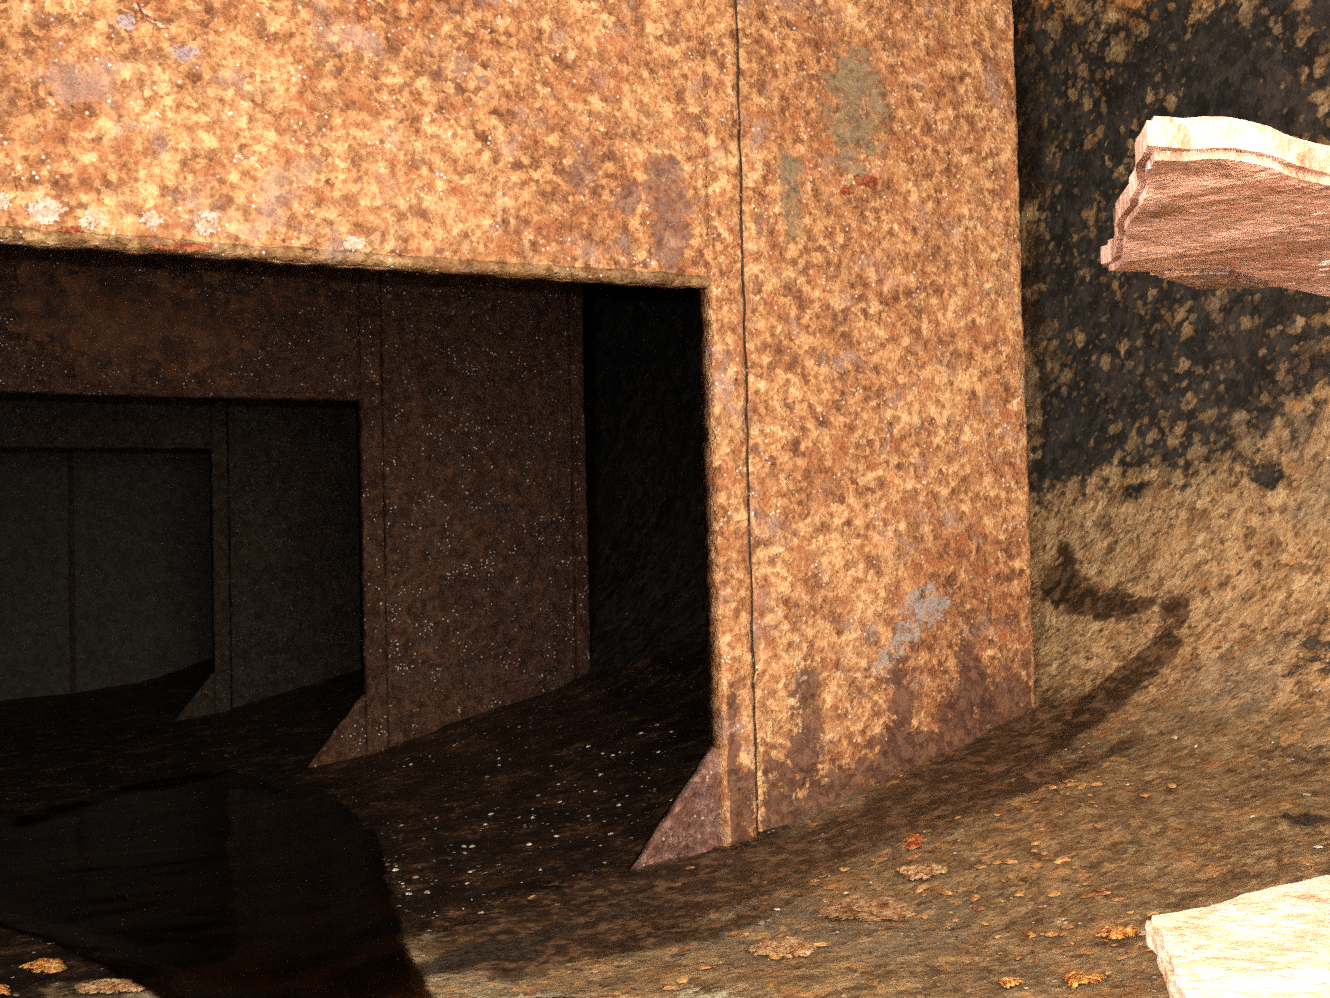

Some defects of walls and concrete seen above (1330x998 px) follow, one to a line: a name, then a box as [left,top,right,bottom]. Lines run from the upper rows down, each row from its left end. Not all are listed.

leakage [409,540,1190,998]